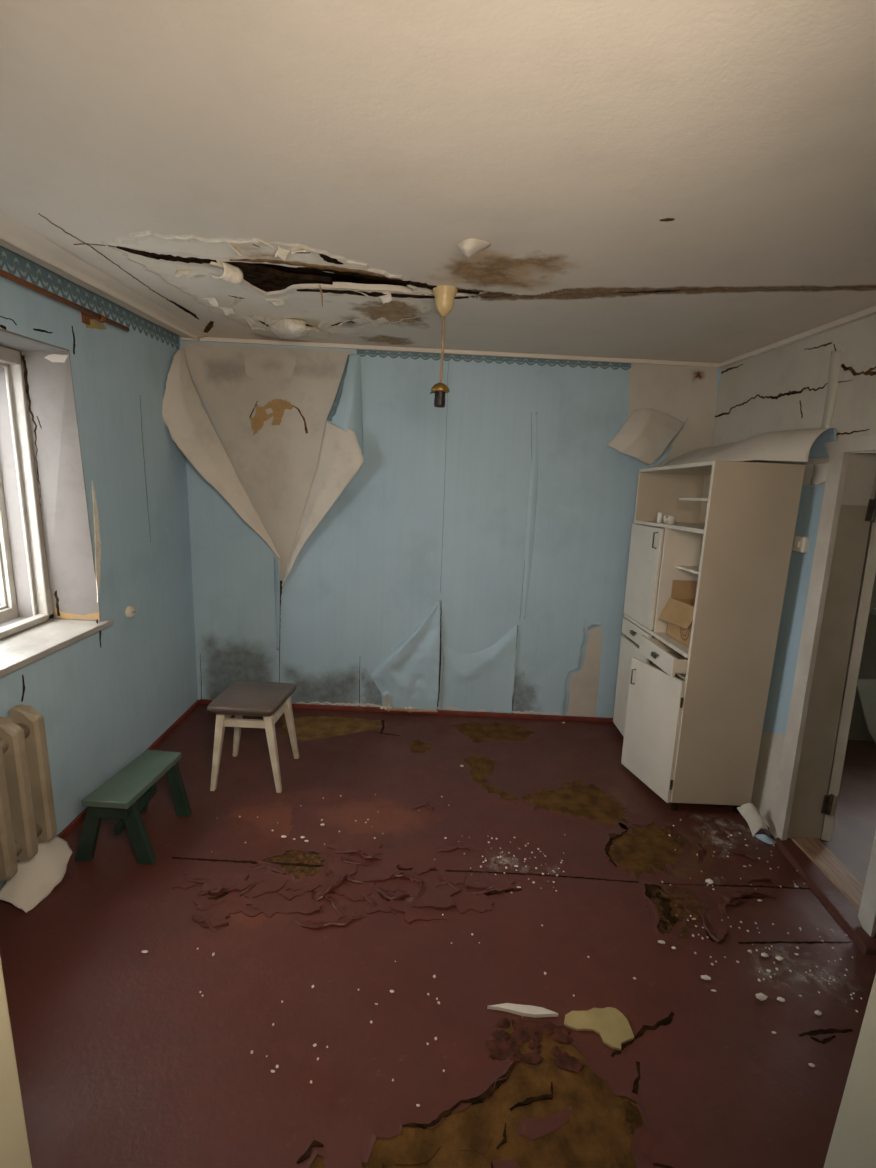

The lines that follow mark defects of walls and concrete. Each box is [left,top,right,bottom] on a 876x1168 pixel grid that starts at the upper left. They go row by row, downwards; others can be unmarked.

water stain [416,239,605,298]
crack [479,285,876,300]
flaking render [76,225,440,580]
flaking render [628,363,717,467]
crack [715,342,876,419]
crack [836,428,869,436]
peeling [599,818,693,881]
peeling [291,1012,662,1168]